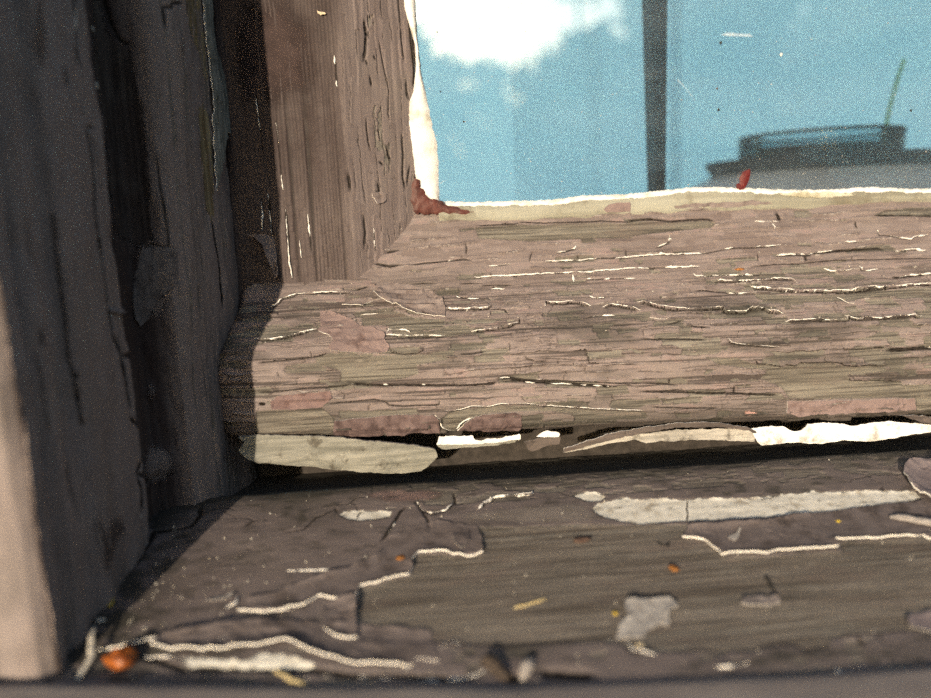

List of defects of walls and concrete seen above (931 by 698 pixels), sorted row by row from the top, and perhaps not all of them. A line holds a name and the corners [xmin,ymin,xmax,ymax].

crack [85,126,134,424]
peeling [92,0,179,326]
peeling [202,0,231,191]
peeling [248,234,278,278]
peeling [255,282,520,382]
crack [363,0,416,192]
peeling [256,358,931,453]
peeling [674,200,772,211]
peeling [878,207,931,216]
peeling [99,457,931,667]